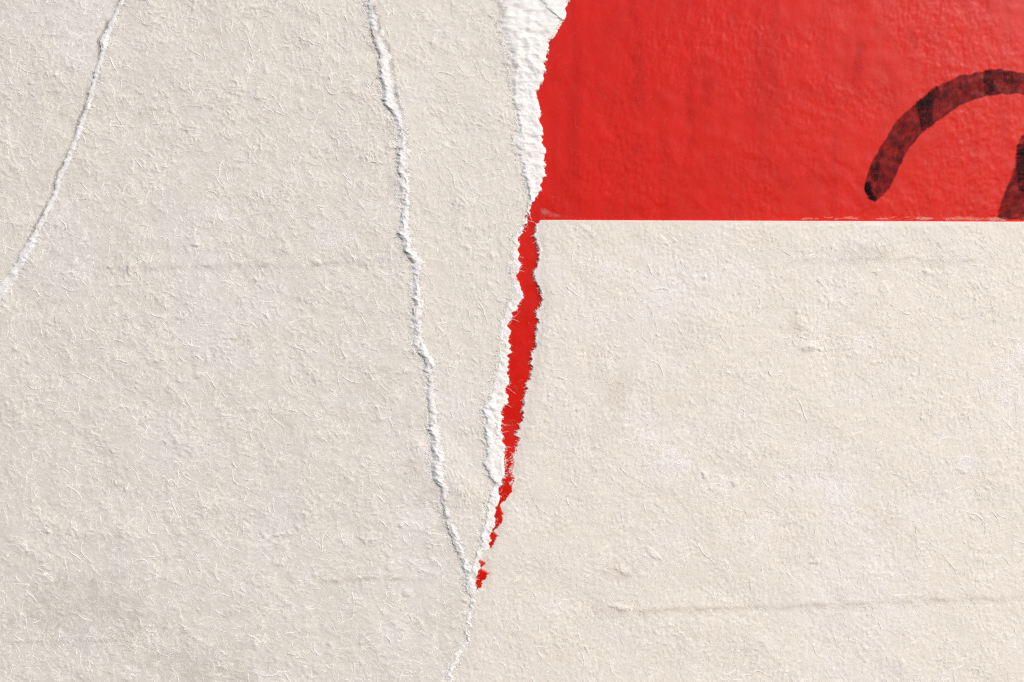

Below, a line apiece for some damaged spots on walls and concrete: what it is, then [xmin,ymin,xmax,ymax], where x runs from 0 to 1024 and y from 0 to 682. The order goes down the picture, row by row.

peeling [397,126,417,261]
peeling [427,419,445,485]